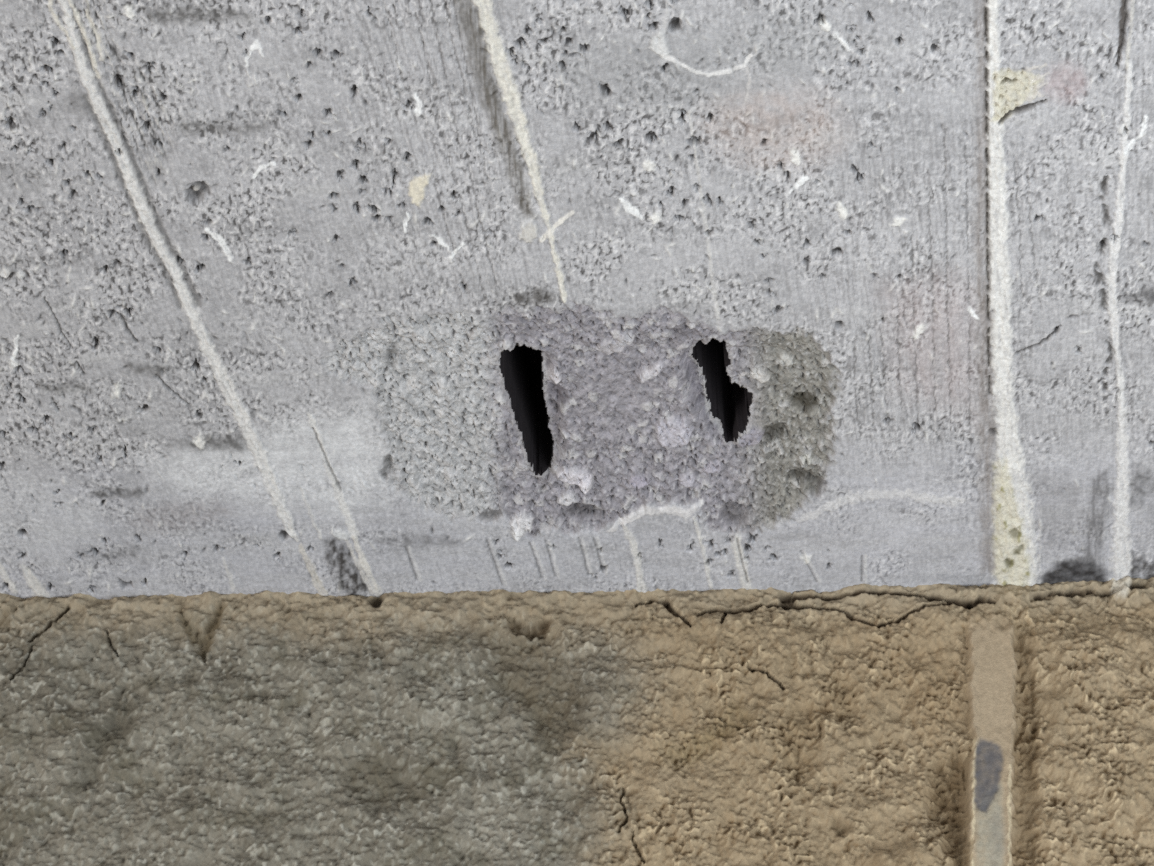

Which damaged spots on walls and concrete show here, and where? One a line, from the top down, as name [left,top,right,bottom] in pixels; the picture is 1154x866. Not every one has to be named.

spalling [851,164,865,184]
spalling [747,218,769,260]
spalling [831,230,851,257]
spalling [764,277,783,315]
spalling [326,303,841,578]
crack [636,586,997,628]
crack [1031,581,1154,602]
crack [10,603,72,680]
crack [106,629,120,657]
crack [747,660,786,690]